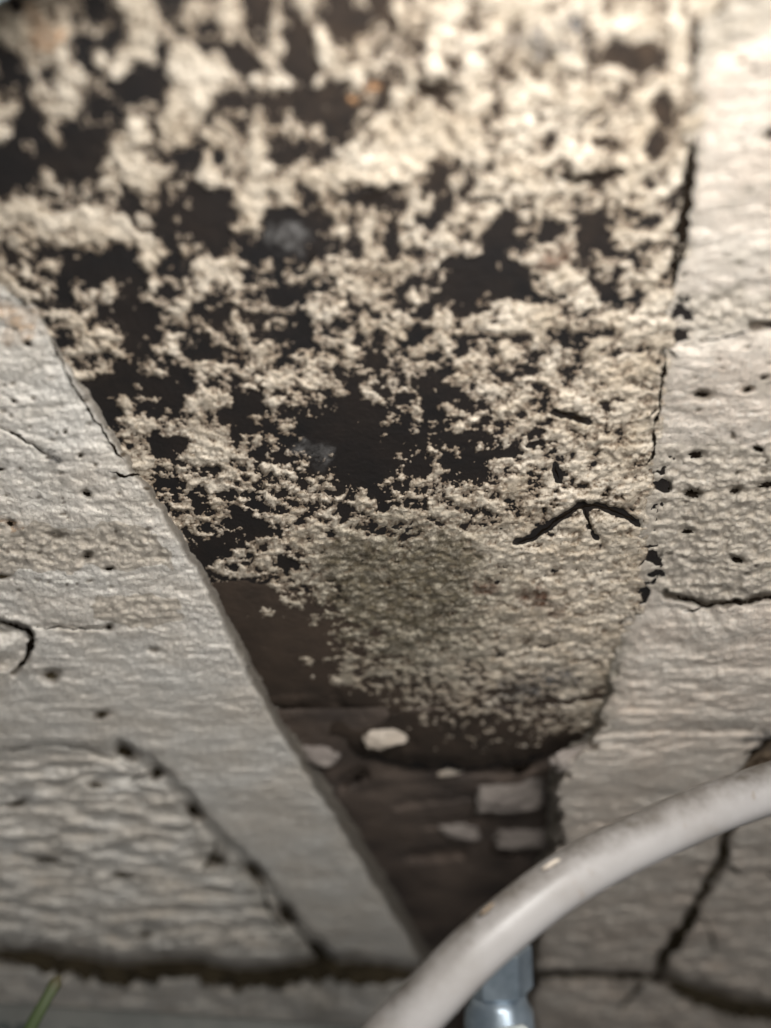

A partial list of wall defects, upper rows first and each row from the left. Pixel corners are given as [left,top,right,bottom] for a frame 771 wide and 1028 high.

crack [706,323,771,341]
peeling [247,389,327,437]
peeling [380,371,438,435]
spalling [0,520,173,579]
crack [518,503,635,543]
spalling [640,438,771,605]
crack [677,595,771,612]
spalling [0,631,27,666]
crack [0,621,108,671]
peeling [211,577,608,769]
crack [0,878,413,995]
crack [535,830,771,1024]